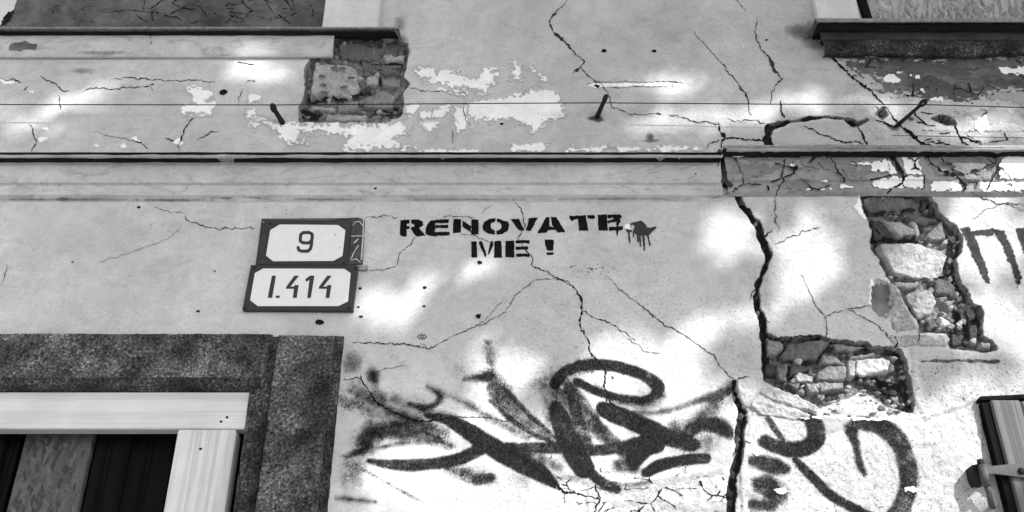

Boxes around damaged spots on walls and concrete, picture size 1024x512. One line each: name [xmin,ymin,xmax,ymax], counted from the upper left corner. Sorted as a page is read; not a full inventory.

crack [3,76,216,109]
crack [97,118,218,149]
flaking render [243,39,703,152]
flaking render [846,56,1024,133]
crack [490,0,1024,512]
flaking render [728,120,1024,433]